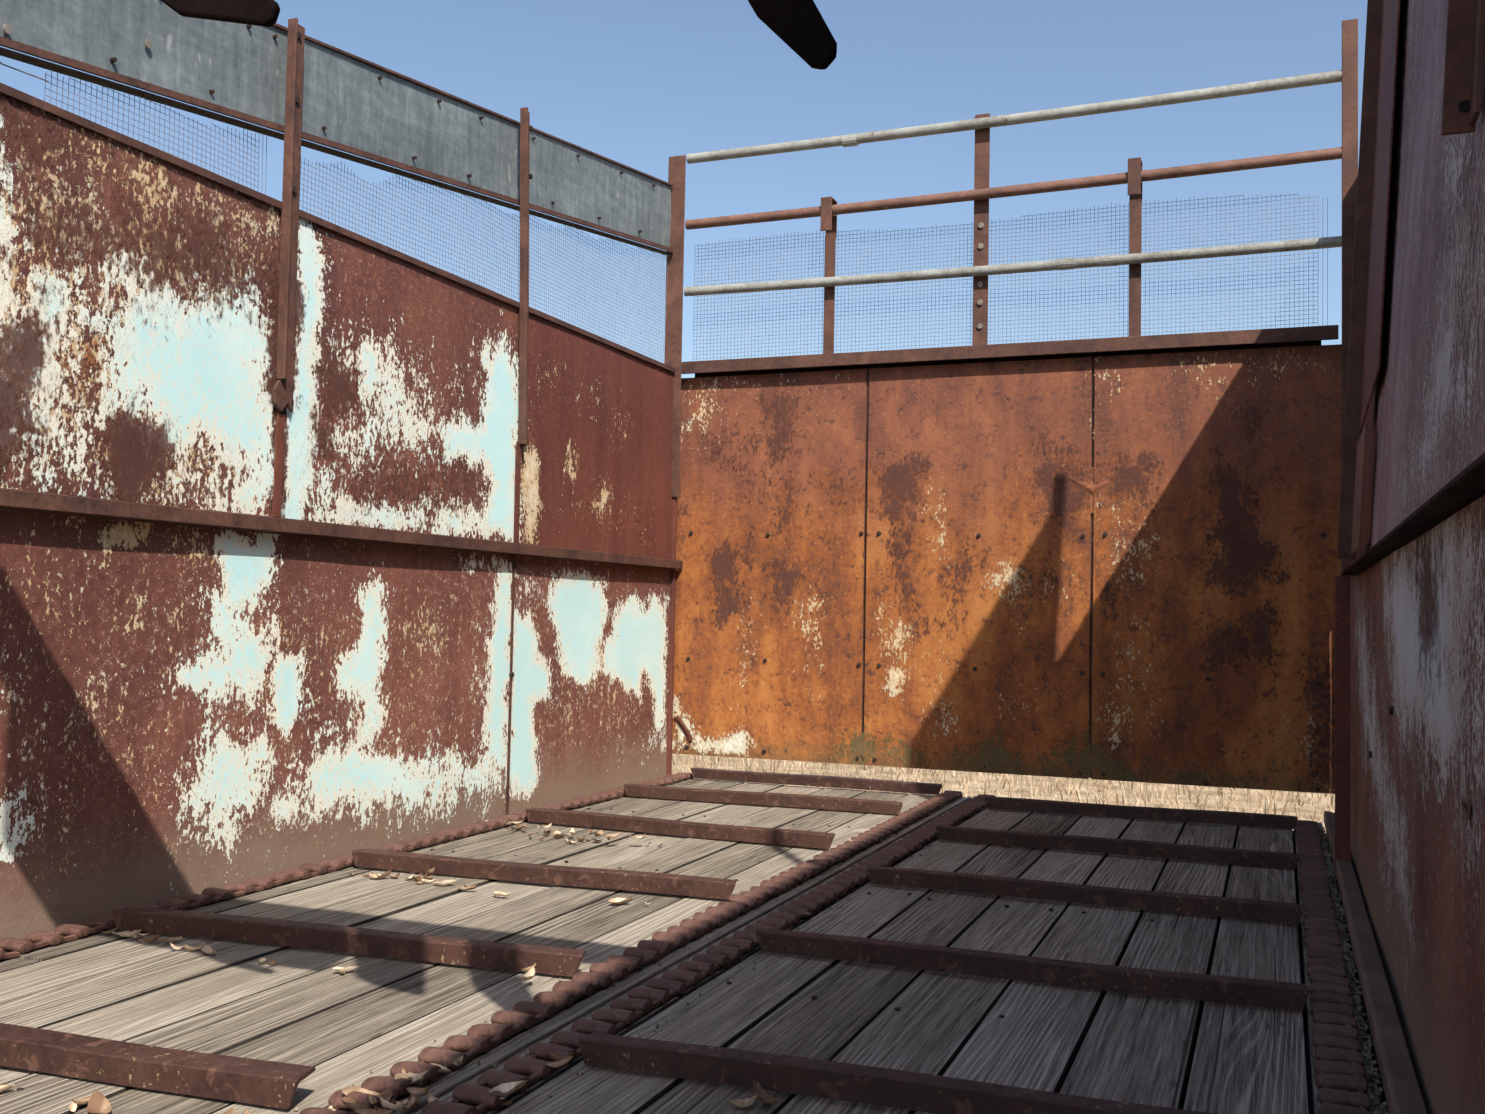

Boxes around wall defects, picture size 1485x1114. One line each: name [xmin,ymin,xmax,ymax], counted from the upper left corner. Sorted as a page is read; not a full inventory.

corrosion [0,93,482,524]
peeling [0,108,757,917]
peeling [730,597,766,687]
peeling [680,372,849,452]
corrosion [700,375,1176,649]
corrosion [1189,445,1335,790]
corrosion [1411,531,1449,705]